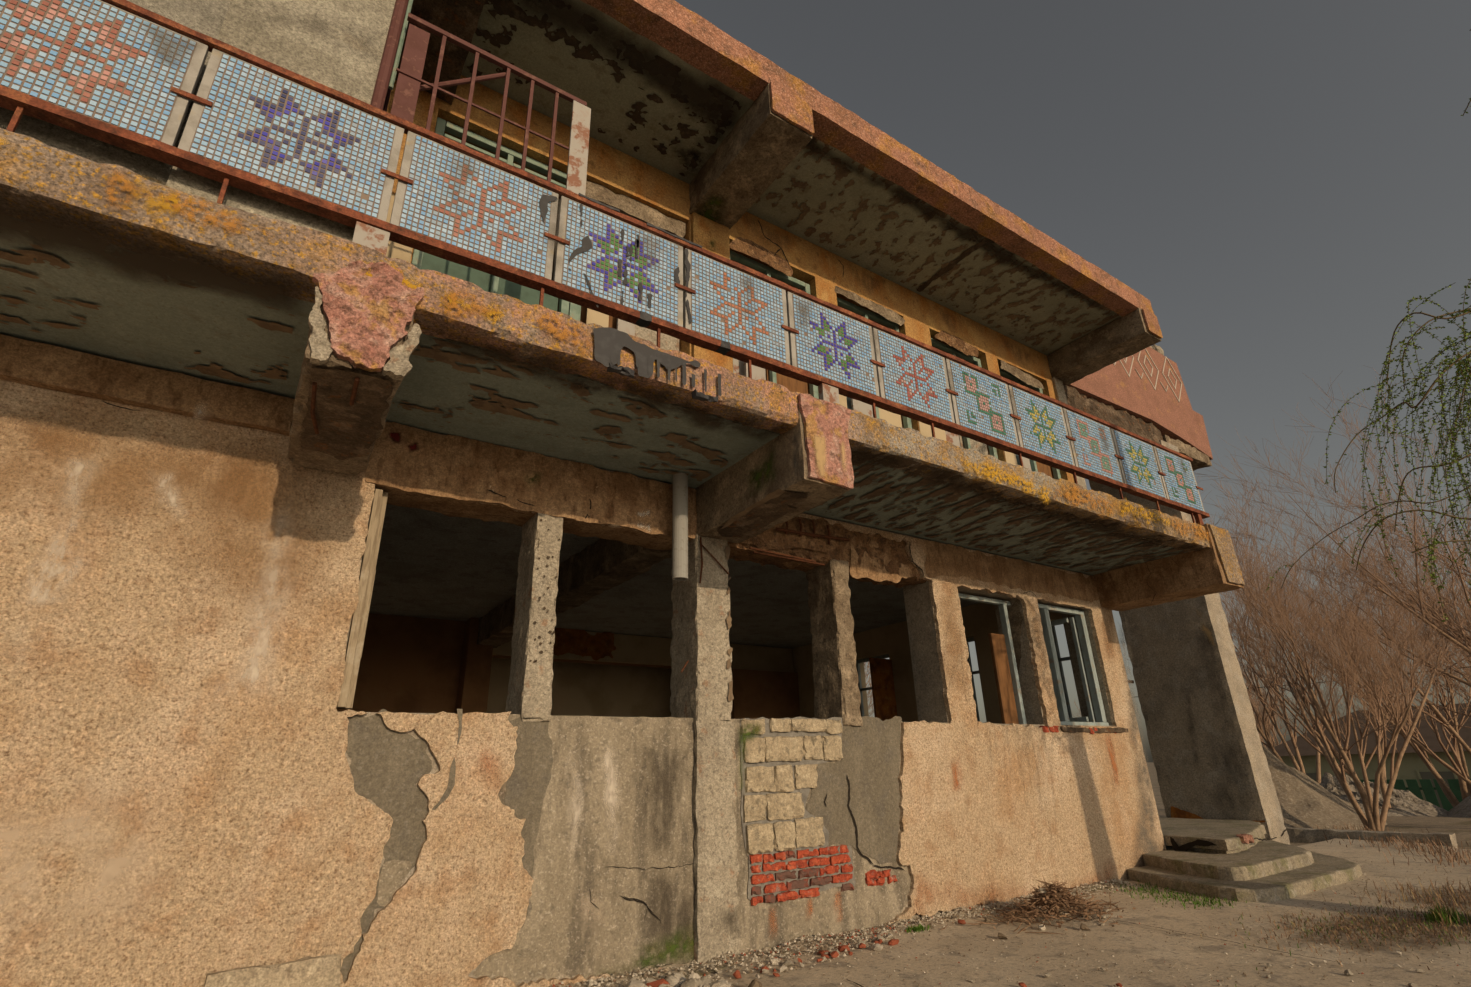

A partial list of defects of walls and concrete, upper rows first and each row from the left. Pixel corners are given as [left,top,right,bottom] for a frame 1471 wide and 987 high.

peeling [466,0,742,176]
spalling [247,286,422,460]
spalling [530,519,616,663]
peeling [699,448,1199,629]
spalling [1008,599,1023,682]
flaking render [341,709,433,982]
flaking render [470,714,696,983]
leakage [653,758,676,840]
leakage [638,881,694,966]
flaking render [729,716,945,950]
crack [824,776,905,871]